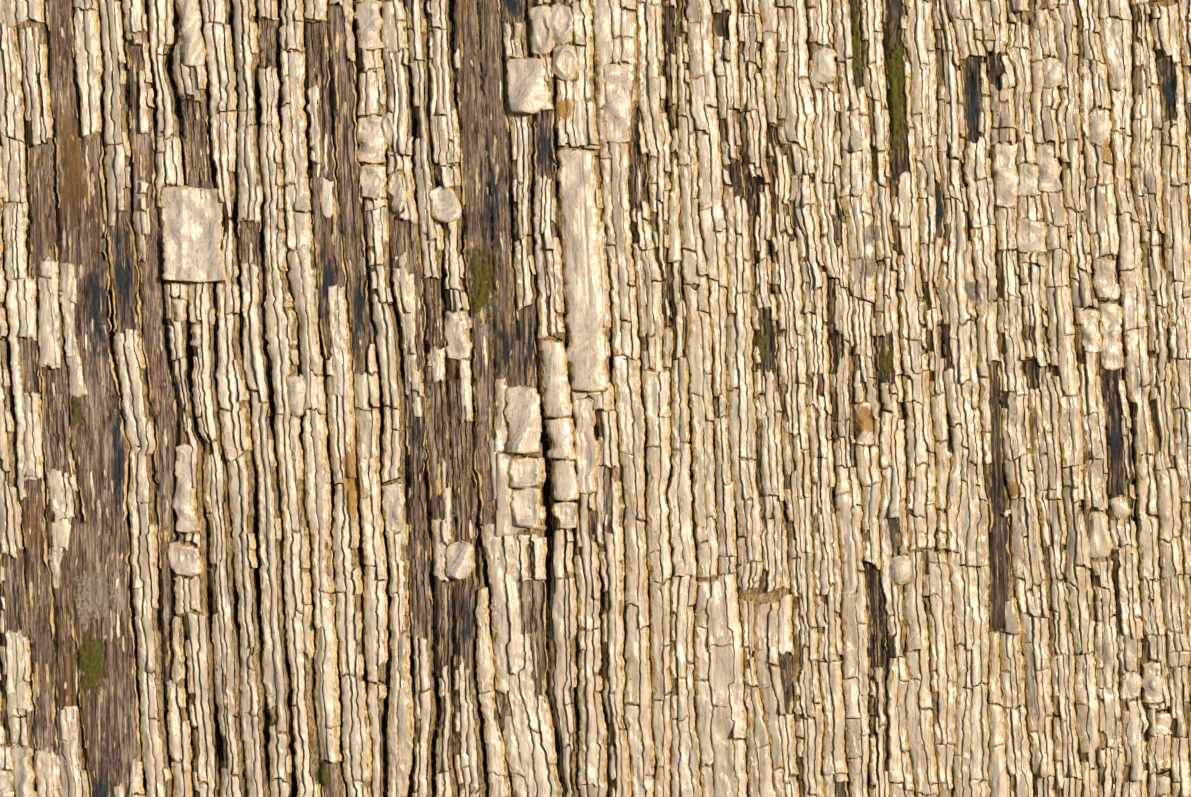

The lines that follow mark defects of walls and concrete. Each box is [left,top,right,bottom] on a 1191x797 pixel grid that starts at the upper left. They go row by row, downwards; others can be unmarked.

crack [0,0,91,797]
peeling [0,0,939,797]
crack [500,0,1191,797]
peeling [902,0,1191,797]